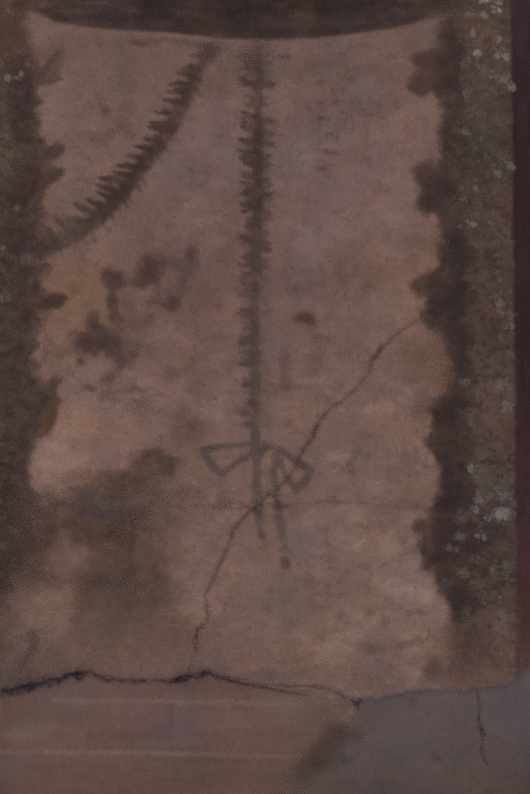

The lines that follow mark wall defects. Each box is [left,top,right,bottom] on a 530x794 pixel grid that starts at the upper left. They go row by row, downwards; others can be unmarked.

crack [3,671,110,693]
crack [162,671,244,684]